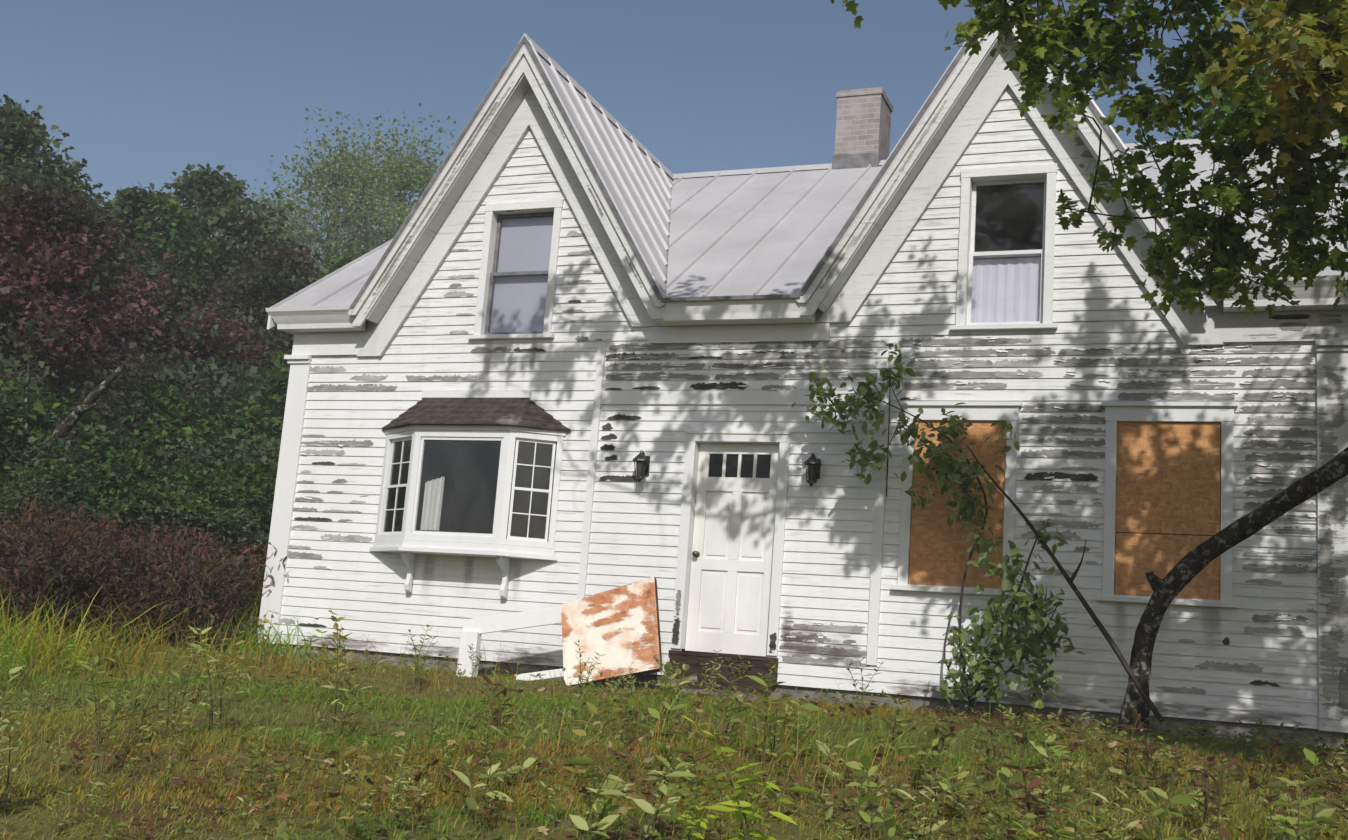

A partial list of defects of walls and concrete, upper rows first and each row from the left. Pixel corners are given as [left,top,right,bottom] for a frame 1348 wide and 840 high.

peeling [566,231,595,255]
peeling [562,300,879,391]
peeling [307,366,477,391]
peeling [599,414,642,482]
peeling [898,314,1347,575]
peeling [288,434,373,569]
peeling [279,616,326,627]
peeling [779,619,871,668]
peeling [1242,476,1348,725]
peeling [1156,686,1207,694]
peeling [1195,661,1280,687]